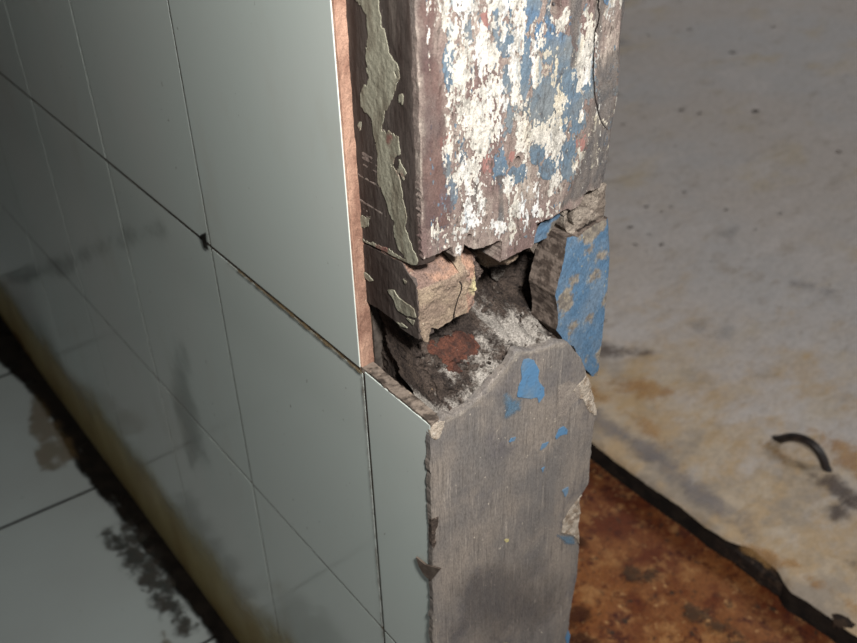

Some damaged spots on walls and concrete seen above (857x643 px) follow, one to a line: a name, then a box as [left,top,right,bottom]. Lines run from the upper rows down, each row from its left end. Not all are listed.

crack [593,0,608,130]
flaking render [356,0,624,440]
damp [0,289,289,643]
peeling [540,426,568,450]
spalling [561,487,582,544]
rust [569,606,599,643]